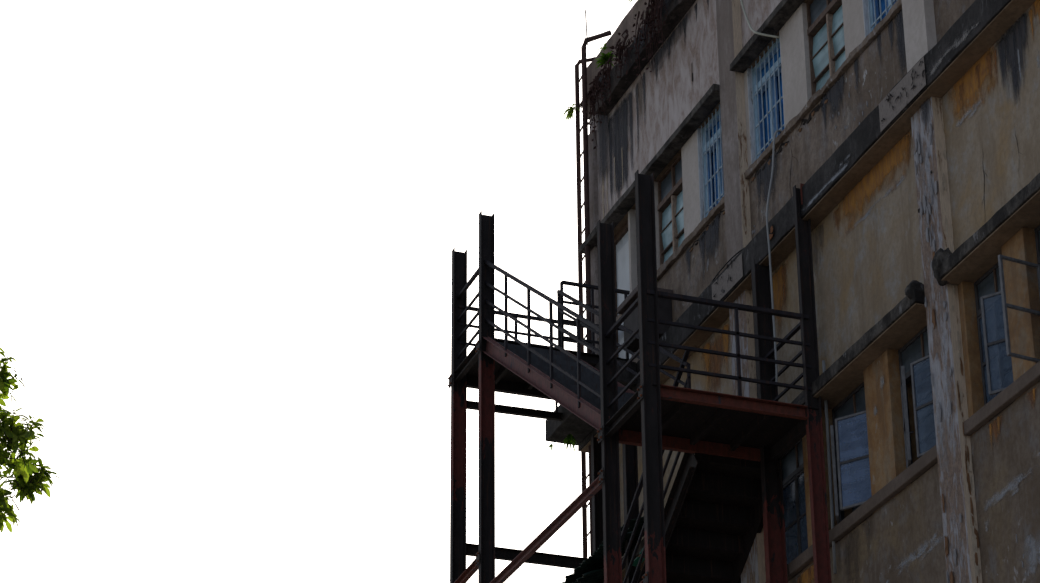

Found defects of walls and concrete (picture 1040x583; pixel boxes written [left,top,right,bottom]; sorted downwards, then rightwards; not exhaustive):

leakage [597,0,709,198]
peeling [879,56,926,132]
leakage [997,14,1027,93]
peeling [963,424,980,583]